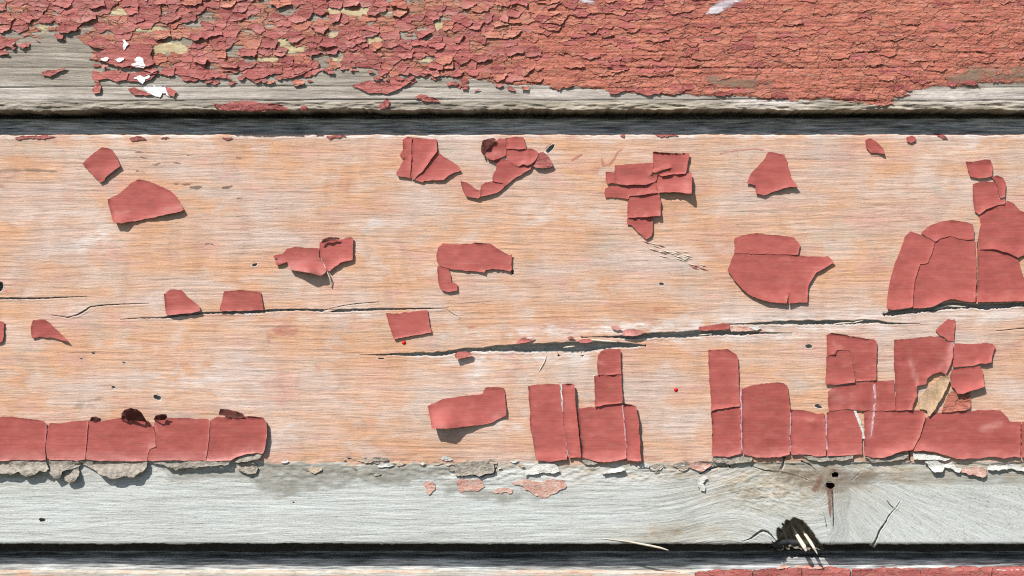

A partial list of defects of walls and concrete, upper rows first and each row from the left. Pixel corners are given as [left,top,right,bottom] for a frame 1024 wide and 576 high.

peeling [0,0,950,109]
peeling [213,100,288,112]
peeling [108,179,184,223]
peeling [396,137,556,198]
peeling [604,152,692,239]
peeling [728,233,834,303]
peeling [887,159,1024,310]
crack [0,294,461,322]
crack [360,300,1024,359]
peeling [0,394,267,483]
peeling [342,457,404,476]
peeling [420,319,1024,498]